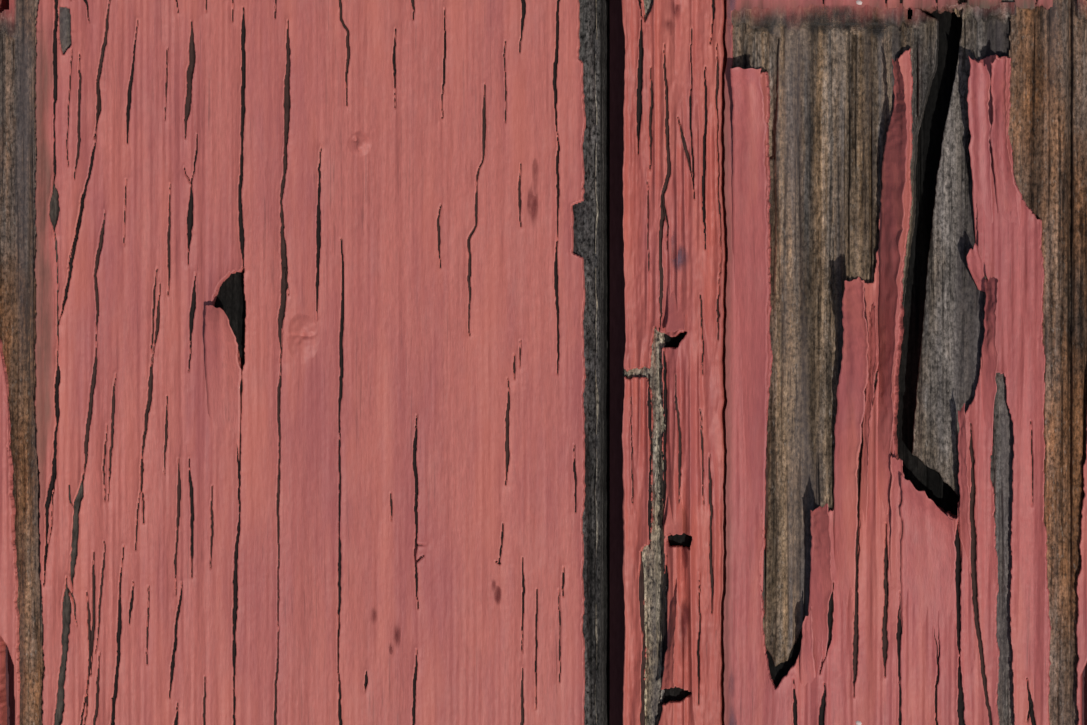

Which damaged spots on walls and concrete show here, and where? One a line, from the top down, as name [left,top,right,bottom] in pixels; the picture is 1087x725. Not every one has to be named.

peeling [0,0,45,725]
crack [43,0,246,725]
peeling [204,269,246,458]
crack [274,0,291,725]
crack [316,149,368,725]
crack [467,0,526,333]
crack [496,523,565,725]
crack [552,0,560,374]
peeling [661,580,677,690]
peeling [664,495,683,536]
crack [630,0,721,725]
peeling [730,0,1087,725]